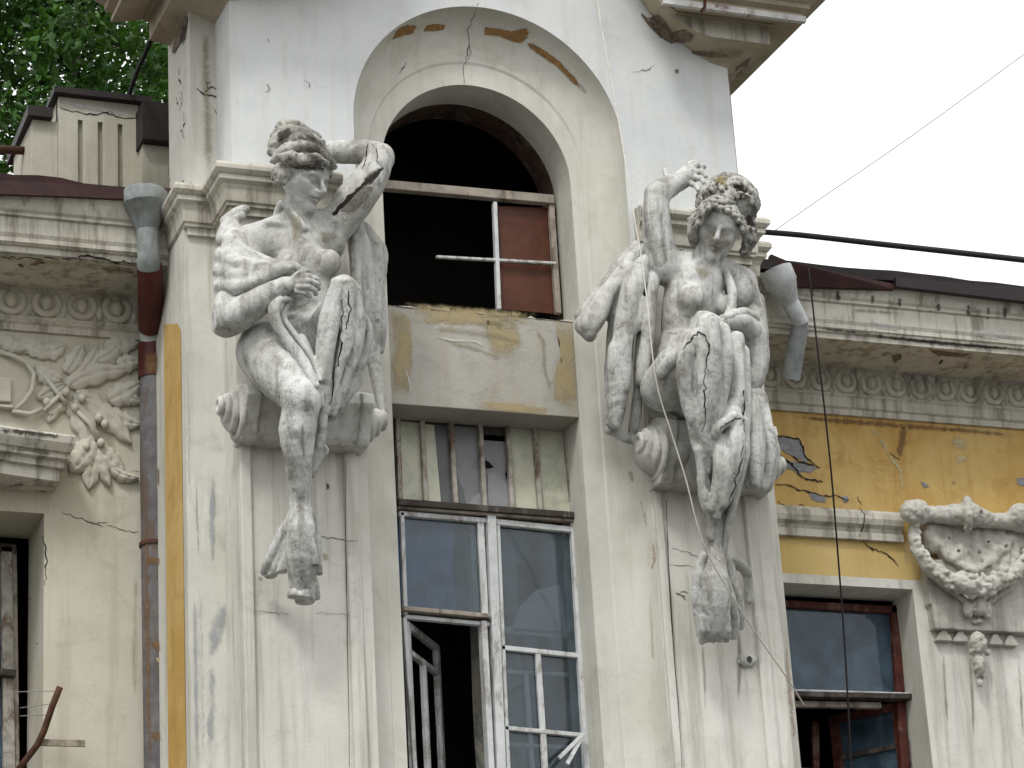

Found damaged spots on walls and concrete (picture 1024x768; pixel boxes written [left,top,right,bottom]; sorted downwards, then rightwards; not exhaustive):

peeling [392,24,445,40]
peeling [484,27,586,93]
spalling [641,13,694,44]
crack [176,71,217,138]
crack [332,143,384,216]
corrosion [147,354,158,372]
crack [329,289,352,405]
peeling [419,305,520,353]
peeling [486,402,544,414]
crack [678,331,746,502]
crack [777,435,898,566]
corrosion [145,533,160,752]